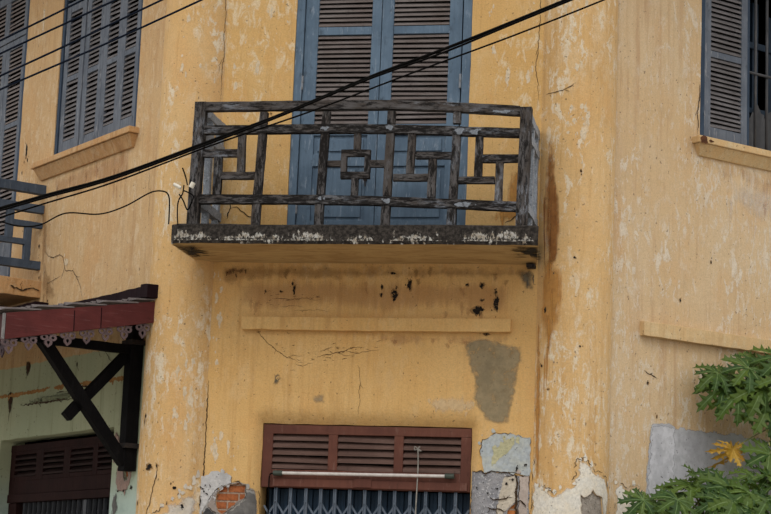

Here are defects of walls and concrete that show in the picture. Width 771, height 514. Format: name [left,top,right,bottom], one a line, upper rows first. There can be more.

crack [535,0,575,104]
crack [10,251,83,300]
peeling [174,230,333,241]
peeling [464,230,533,241]
crack [258,331,372,418]
peeling [149,430,257,514]
peeling [476,428,642,514]